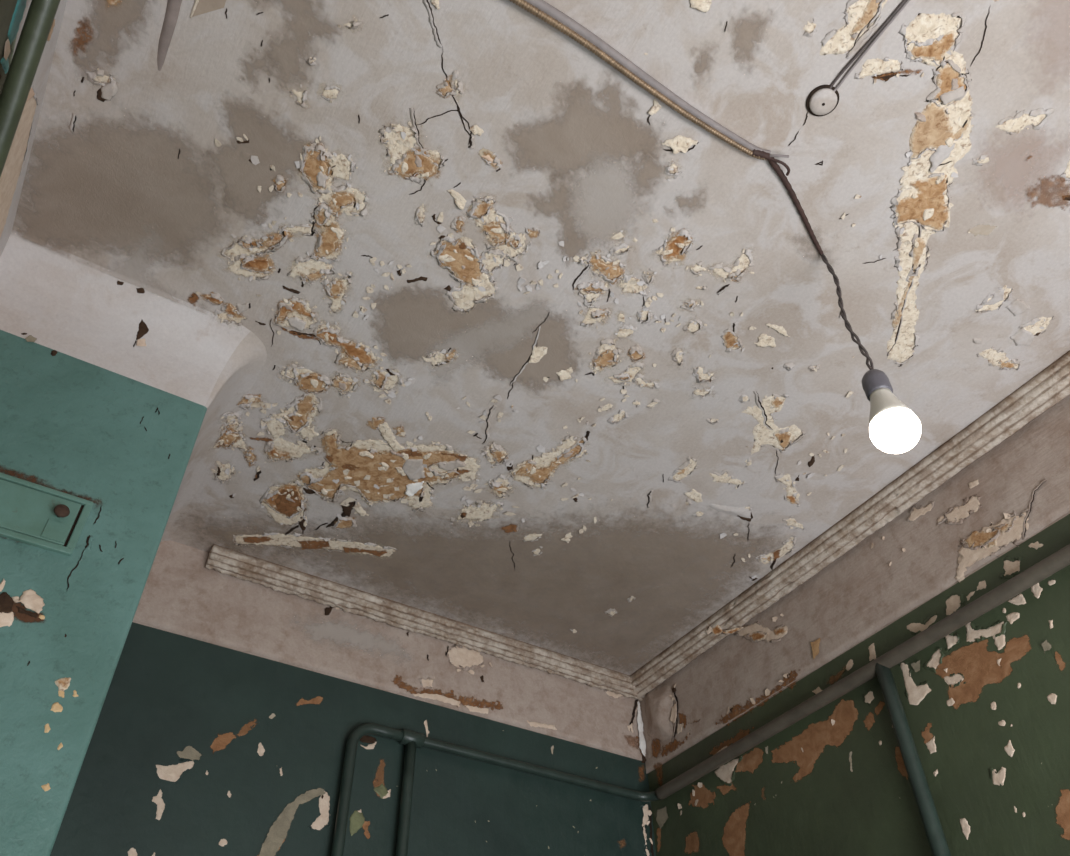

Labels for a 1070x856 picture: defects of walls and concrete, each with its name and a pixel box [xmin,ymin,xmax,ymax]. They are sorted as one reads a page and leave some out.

damp [16,104,318,302]
crack [409,0,475,195]
damp [509,83,665,259]
spalling [855,12,990,367]
spalling [189,134,754,569]
damp [371,288,577,388]
crack [475,312,550,445]
corrosion [0,466,101,504]
damp [206,520,766,671]
peeling [899,580,1065,709]
peeling [152,746,202,820]
peeling [257,788,331,856]